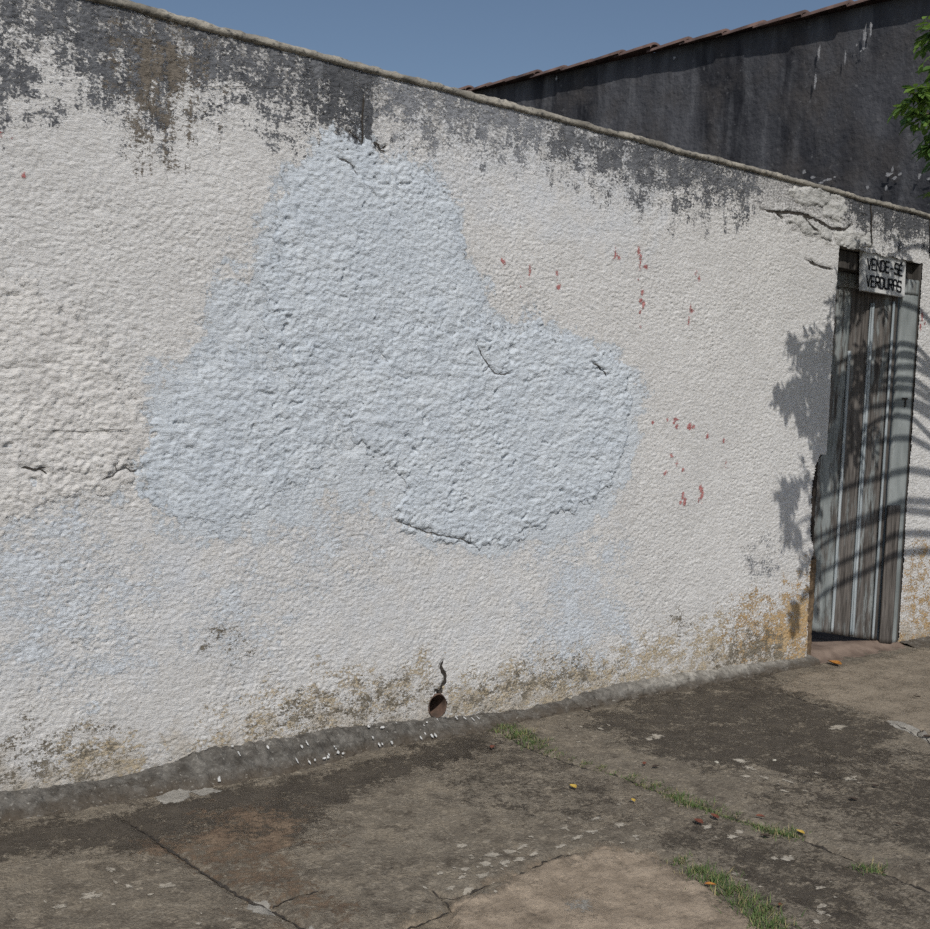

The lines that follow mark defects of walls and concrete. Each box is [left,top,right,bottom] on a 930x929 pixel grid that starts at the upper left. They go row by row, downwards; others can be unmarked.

leakage [0,0,773,237]
leakage [844,196,930,257]
crack [397,521,478,544]
crack [434,661,447,693]
leakage [193,596,745,751]
crack [498,732,770,831]
crack [121,816,318,929]
crack [794,836,930,893]
crack [407,885,489,929]